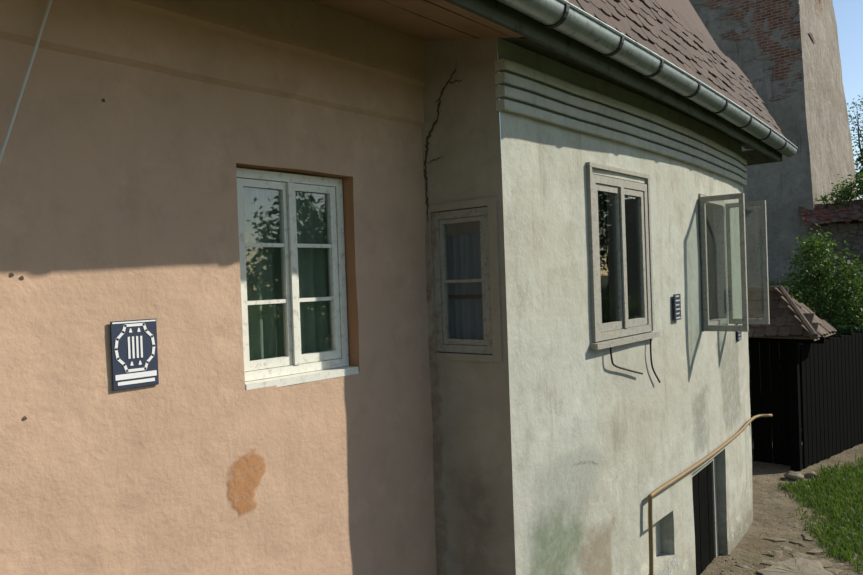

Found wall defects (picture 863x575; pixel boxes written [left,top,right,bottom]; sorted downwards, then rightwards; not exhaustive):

crack [423,60,462,223]